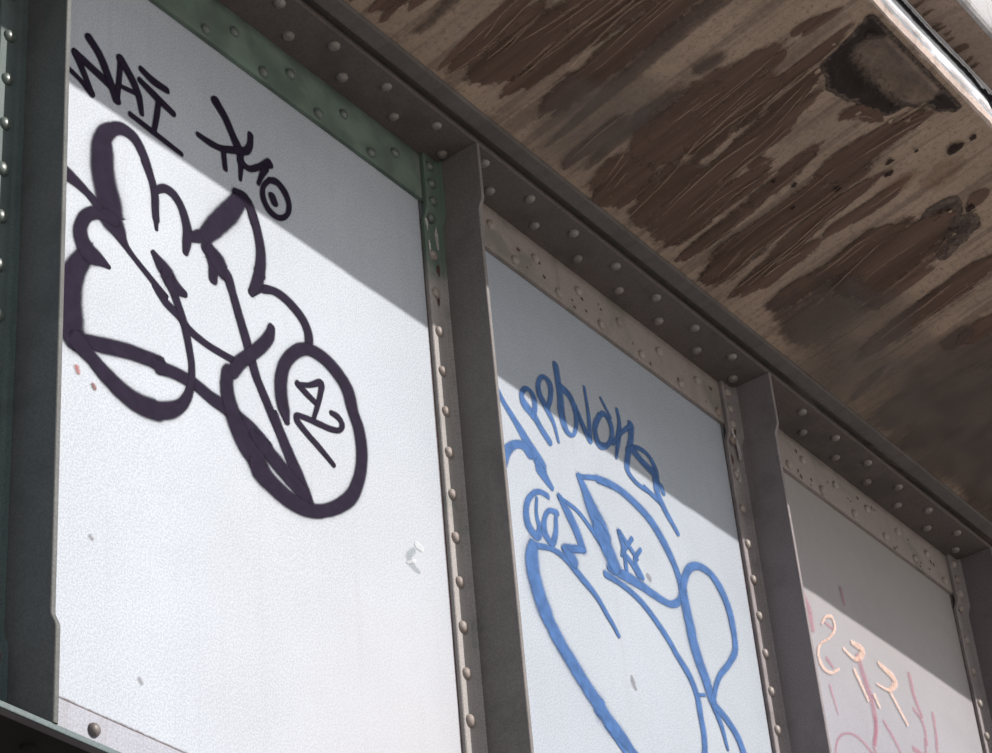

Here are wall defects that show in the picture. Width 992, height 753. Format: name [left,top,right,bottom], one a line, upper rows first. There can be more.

damp [368,0,426,23]
damp [436,0,732,146]
spalling [811,15,962,128]
crack [898,0,992,106]
damp [561,7,990,347]
spalling [921,196,981,261]
damp [853,254,992,363]